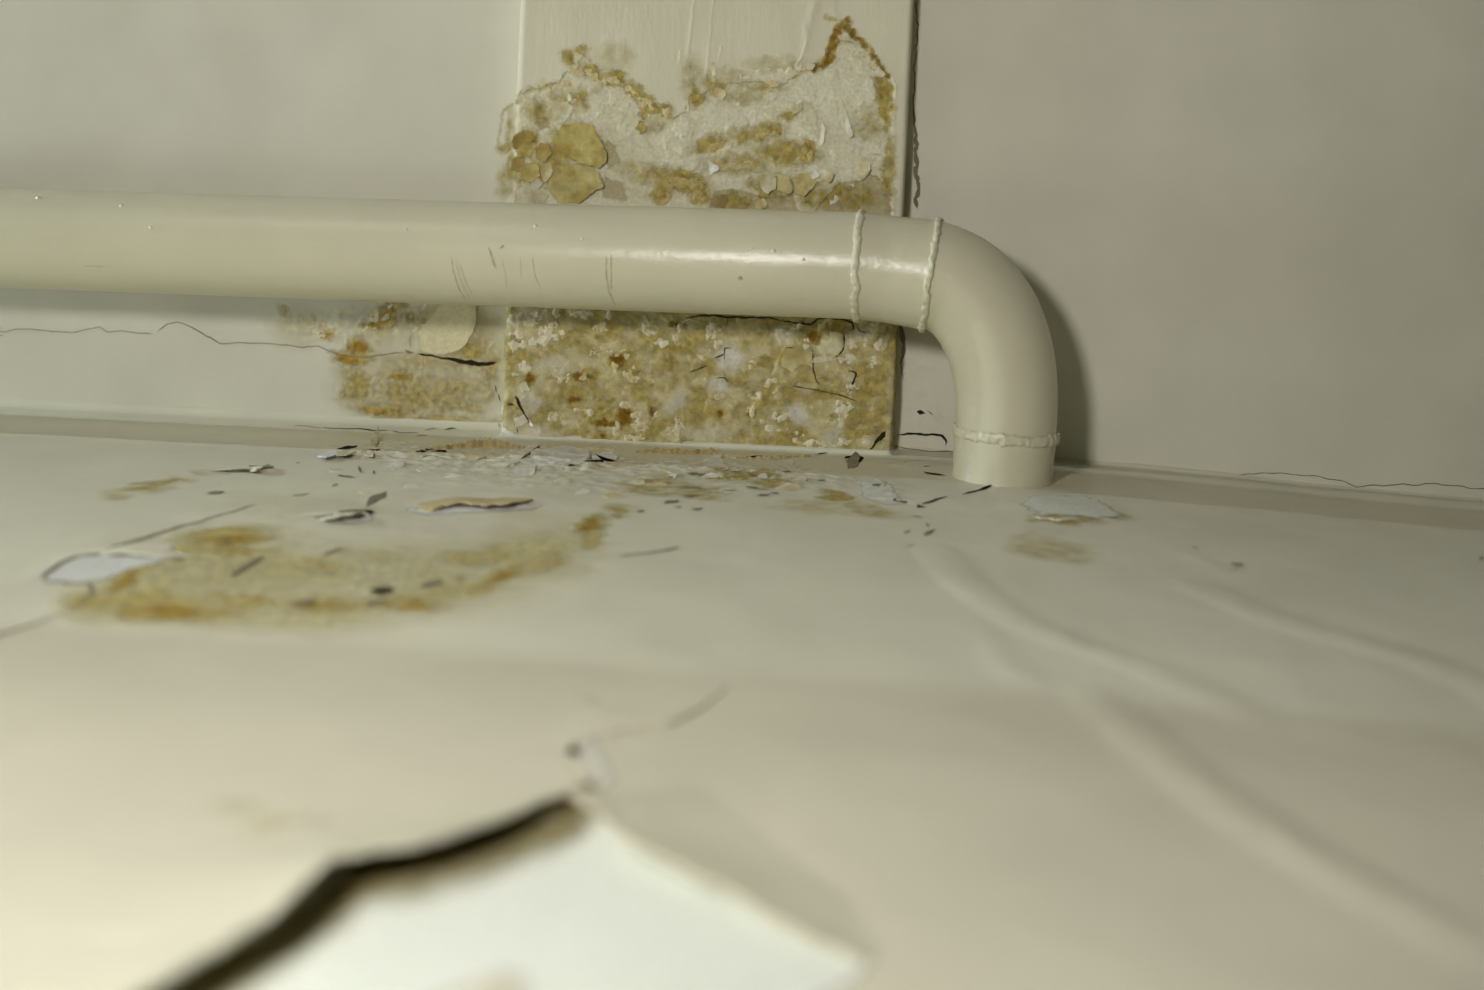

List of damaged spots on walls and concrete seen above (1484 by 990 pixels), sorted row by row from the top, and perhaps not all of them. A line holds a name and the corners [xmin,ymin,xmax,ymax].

peeling [511,40,894,215]
crack [0,322,497,366]
crack [296,425,456,453]
damp [319,302,474,422]
crack [498,396,529,432]
crack [565,454,614,467]
flaking render [315,306,921,505]
damp [453,308,899,449]
damp [628,467,790,498]
damp [818,490,888,516]
peeling [21,504,256,603]
damp [70,507,627,623]